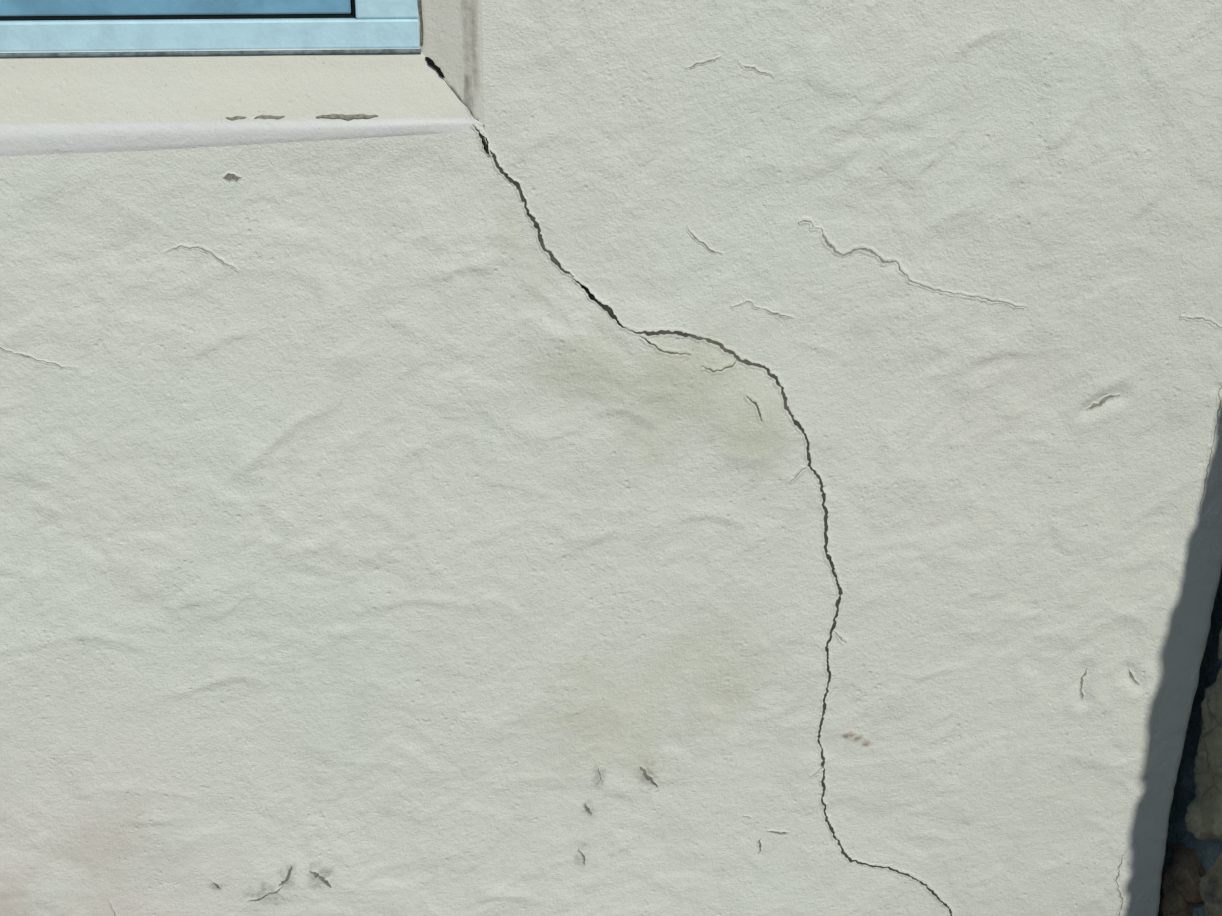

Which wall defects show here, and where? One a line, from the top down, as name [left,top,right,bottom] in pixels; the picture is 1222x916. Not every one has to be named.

crack [425,54,955,916]
crack [798,216,1026,311]